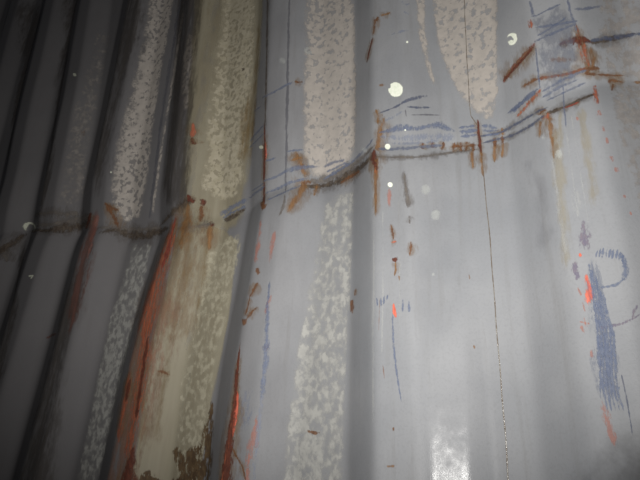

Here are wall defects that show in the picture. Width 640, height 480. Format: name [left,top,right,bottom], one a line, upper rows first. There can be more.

rust [503,44,534,82]
rust [524,25,635,90]
rust [371,110,384,212]
rust [471,120,483,175]
rust [117,205,191,480]
rust [221,349,246,480]